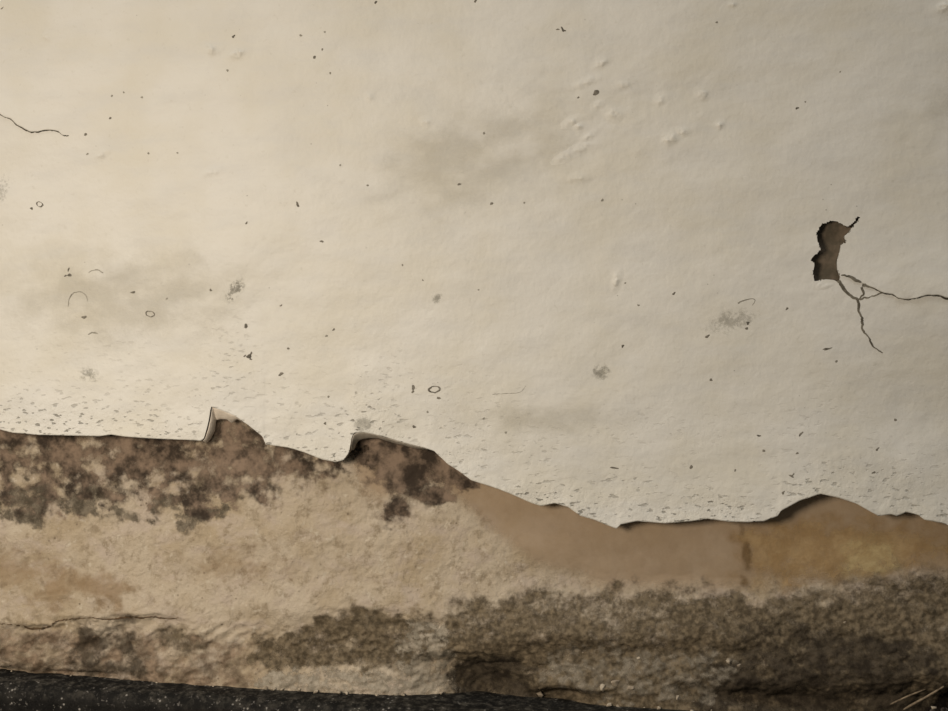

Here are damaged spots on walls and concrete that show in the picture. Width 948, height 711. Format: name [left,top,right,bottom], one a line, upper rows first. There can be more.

crack [0,114,69,136]
hole [811,217,860,290]
crack [837,274,948,353]
mould [0,419,345,532]
flaking render [0,407,948,695]
damp [254,621,466,695]